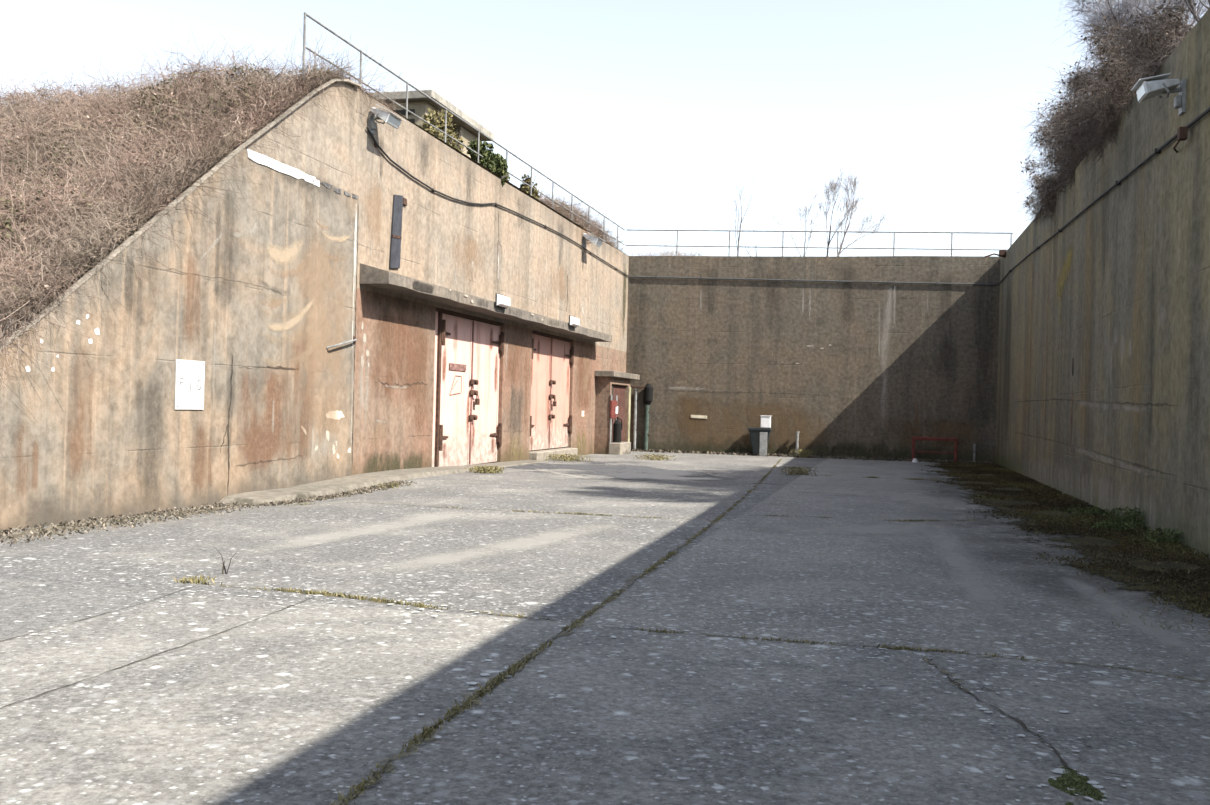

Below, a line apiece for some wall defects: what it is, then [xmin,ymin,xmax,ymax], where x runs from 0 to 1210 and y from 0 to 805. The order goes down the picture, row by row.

crack [1,459,1209,805]